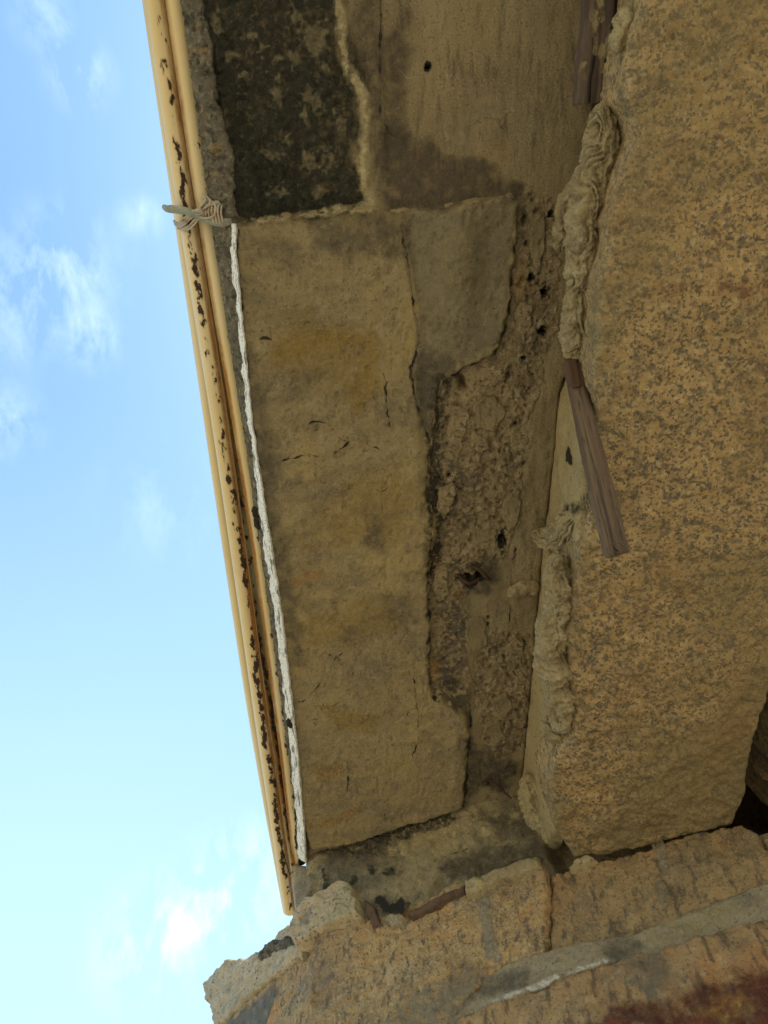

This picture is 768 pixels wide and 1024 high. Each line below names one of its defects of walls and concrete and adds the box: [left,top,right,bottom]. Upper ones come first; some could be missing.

water stain [203,0,522,223]
rust [195,225,305,910]
spalling [428,186,563,758]
water stain [441,820,559,879]